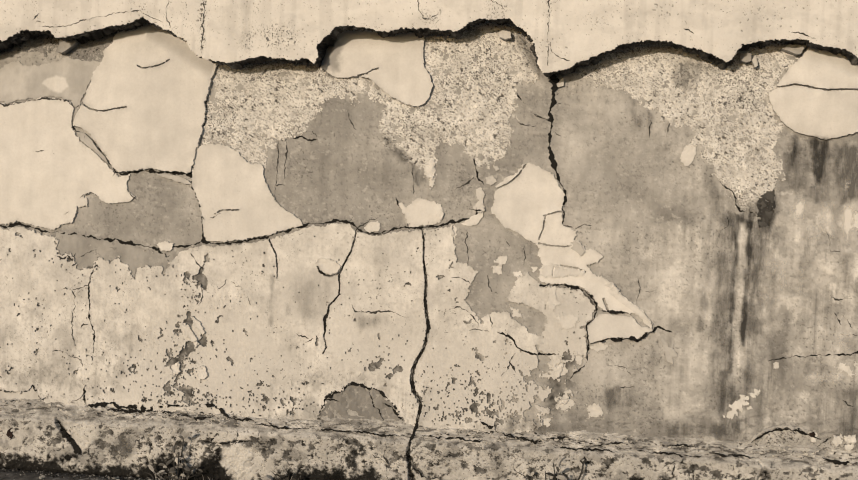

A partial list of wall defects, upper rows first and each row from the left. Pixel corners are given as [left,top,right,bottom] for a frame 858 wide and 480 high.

crack [517,0,591,229]
spalling [576,41,806,228]
peeling [0,20,678,380]
damp [812,138,858,241]
damp [735,201,776,281]
crack [0,97,858,480]
damp [716,284,753,353]
spalling [0,387,40,400]
spalling [320,385,404,423]
peeling [540,395,603,427]
peeling [723,389,760,419]
spalling [743,425,856,453]